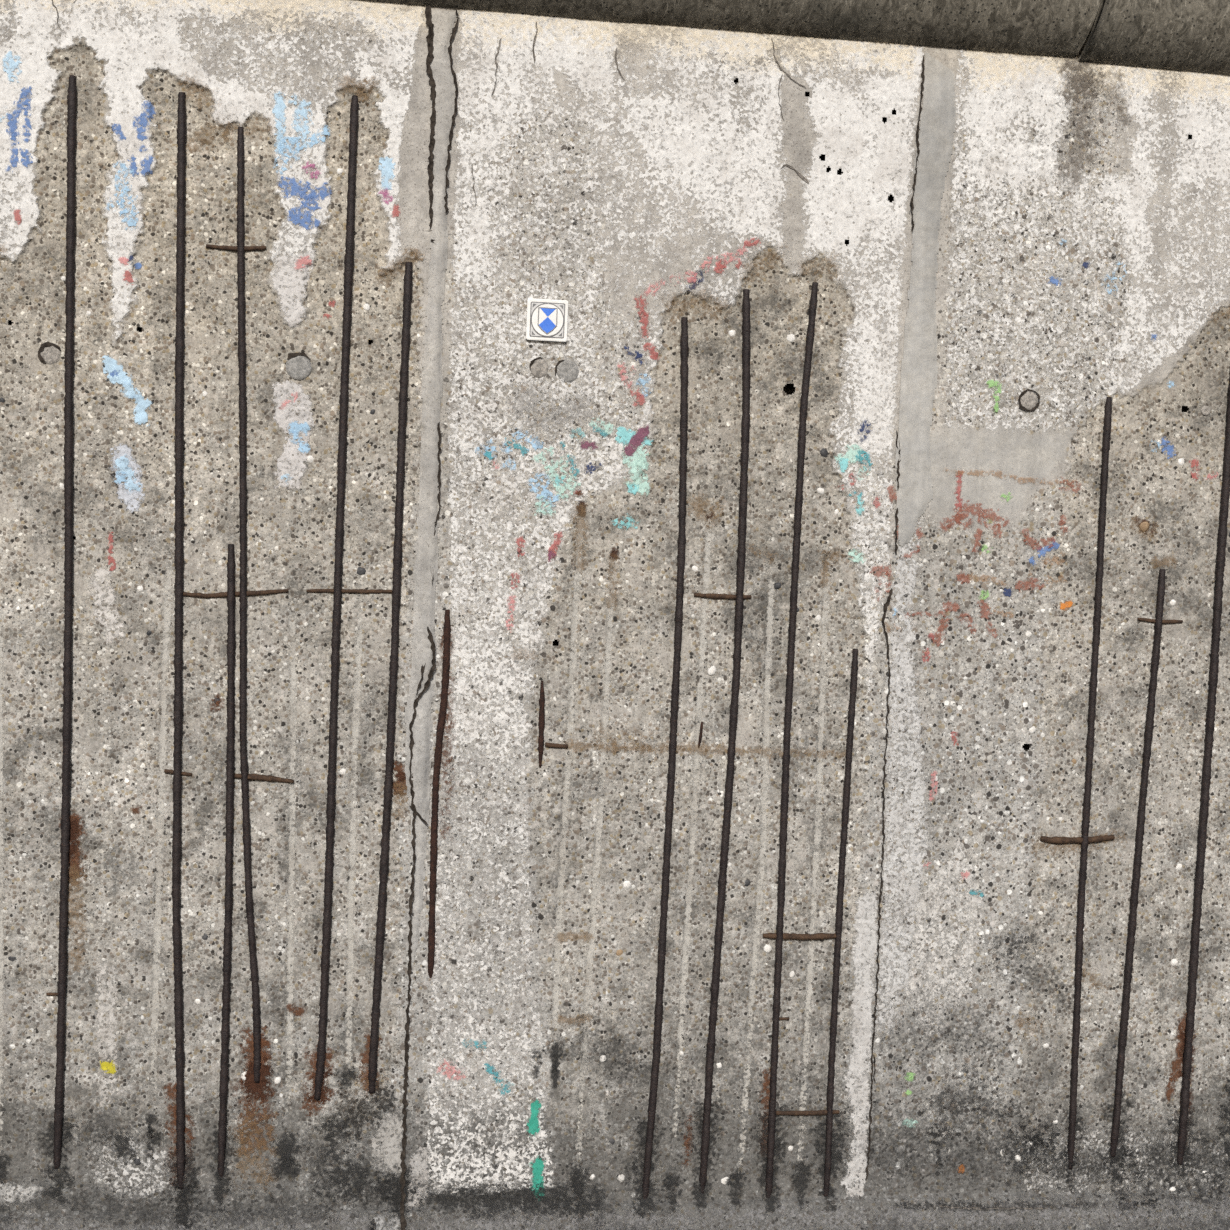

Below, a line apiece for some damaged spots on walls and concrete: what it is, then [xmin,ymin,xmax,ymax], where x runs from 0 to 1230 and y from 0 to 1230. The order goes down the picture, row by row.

crack [428,422,442,585]
spalling [0,0,997,1211]
spalling [942,49,1230,1198]
corrosion [59,813,87,886]
crack [400,627,436,1230]
crack [866,589,893,1181]
corrosion [235,1026,278,1155]
leakage [341,1068,356,1088]
peeling [373,1215,400,1230]
leakage [532,1042,567,1088]
leakage [0,1079,1230,1230]
corrosion [1162,1013,1196,1148]